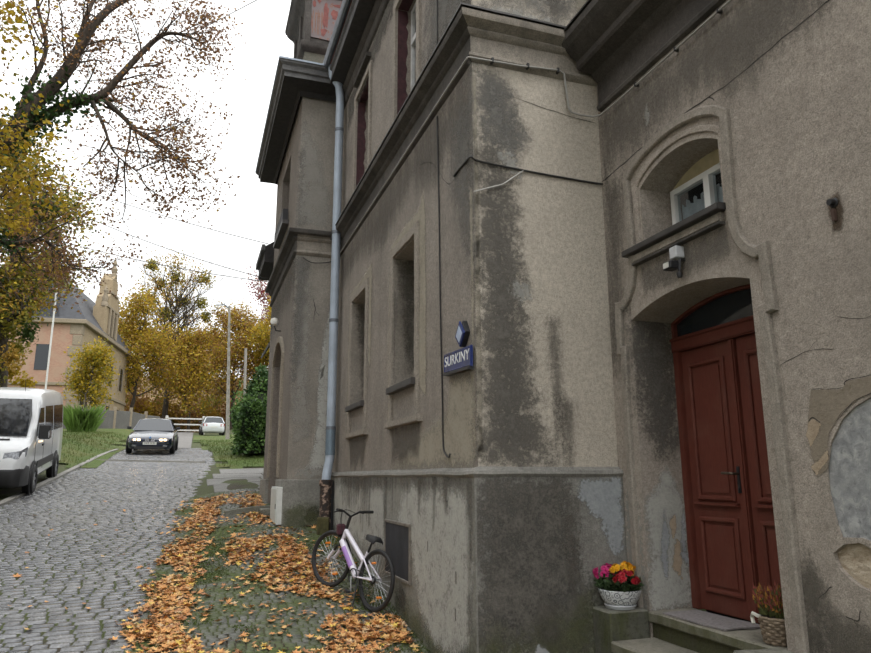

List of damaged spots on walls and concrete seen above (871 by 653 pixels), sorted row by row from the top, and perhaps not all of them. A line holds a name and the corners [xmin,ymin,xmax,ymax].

water stain [423,0,467,61]
water stain [342,63,594,653]
flaking render [645,468,692,611]
flaking render [806,375,871,589]